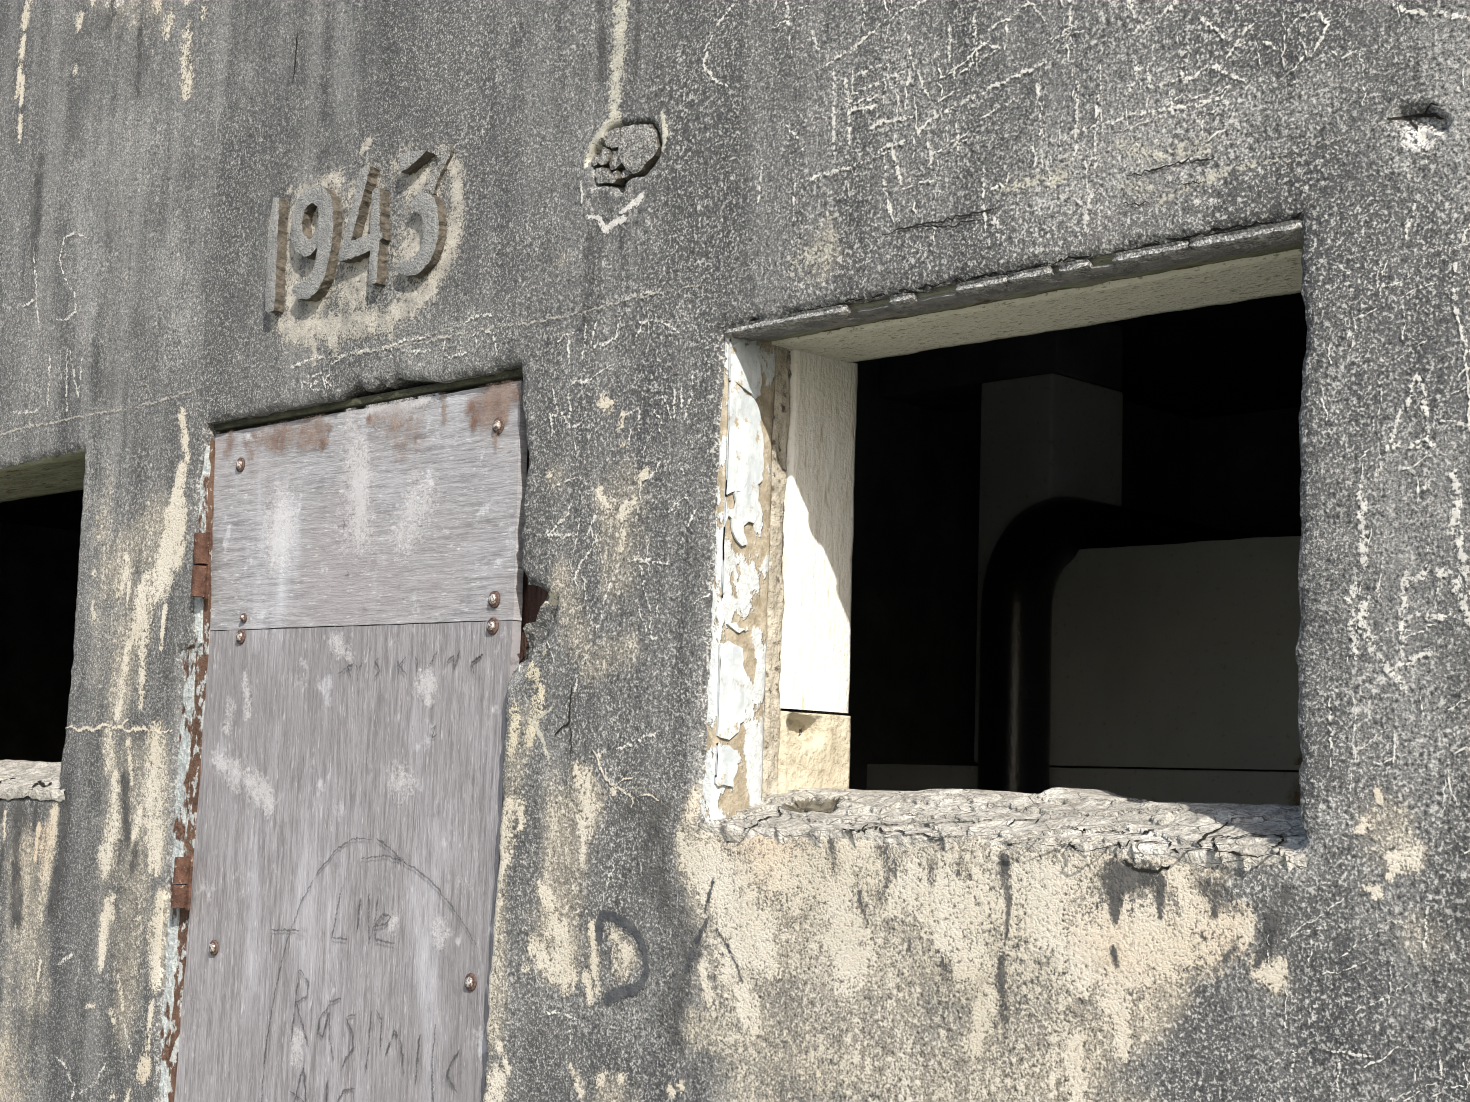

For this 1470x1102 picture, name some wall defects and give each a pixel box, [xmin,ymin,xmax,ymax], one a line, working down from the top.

rust [466,382,520,449]
leakage [46,771,72,924]
leakage [120,771,139,876]
leakage [828,838,837,876]
leakage [856,845,897,925]
leakage [994,852,1013,1024]
crack [842,803,1299,874]
leakage [1099,858,1167,924]
leakage [1198,876,1234,919]
leakage [1251,883,1294,972]